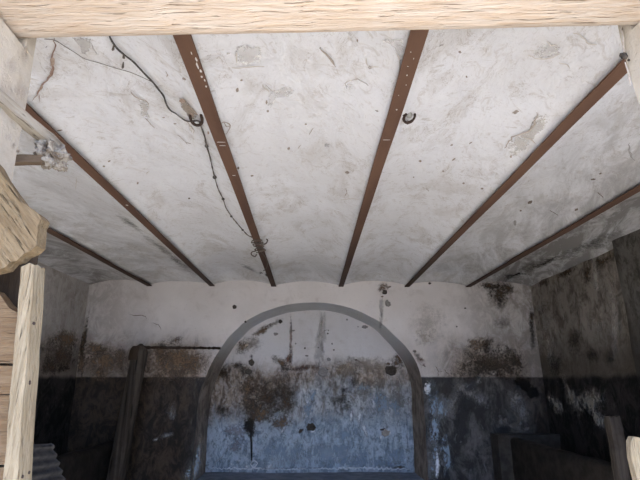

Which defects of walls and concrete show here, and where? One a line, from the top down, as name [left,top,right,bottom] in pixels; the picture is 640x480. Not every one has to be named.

crack [32,38,57,101]
leakage [481,273,520,307]
leakage [41,317,126,377]
leakage [272,355,314,371]
leakage [212,363,408,471]
leakage [426,340,540,476]